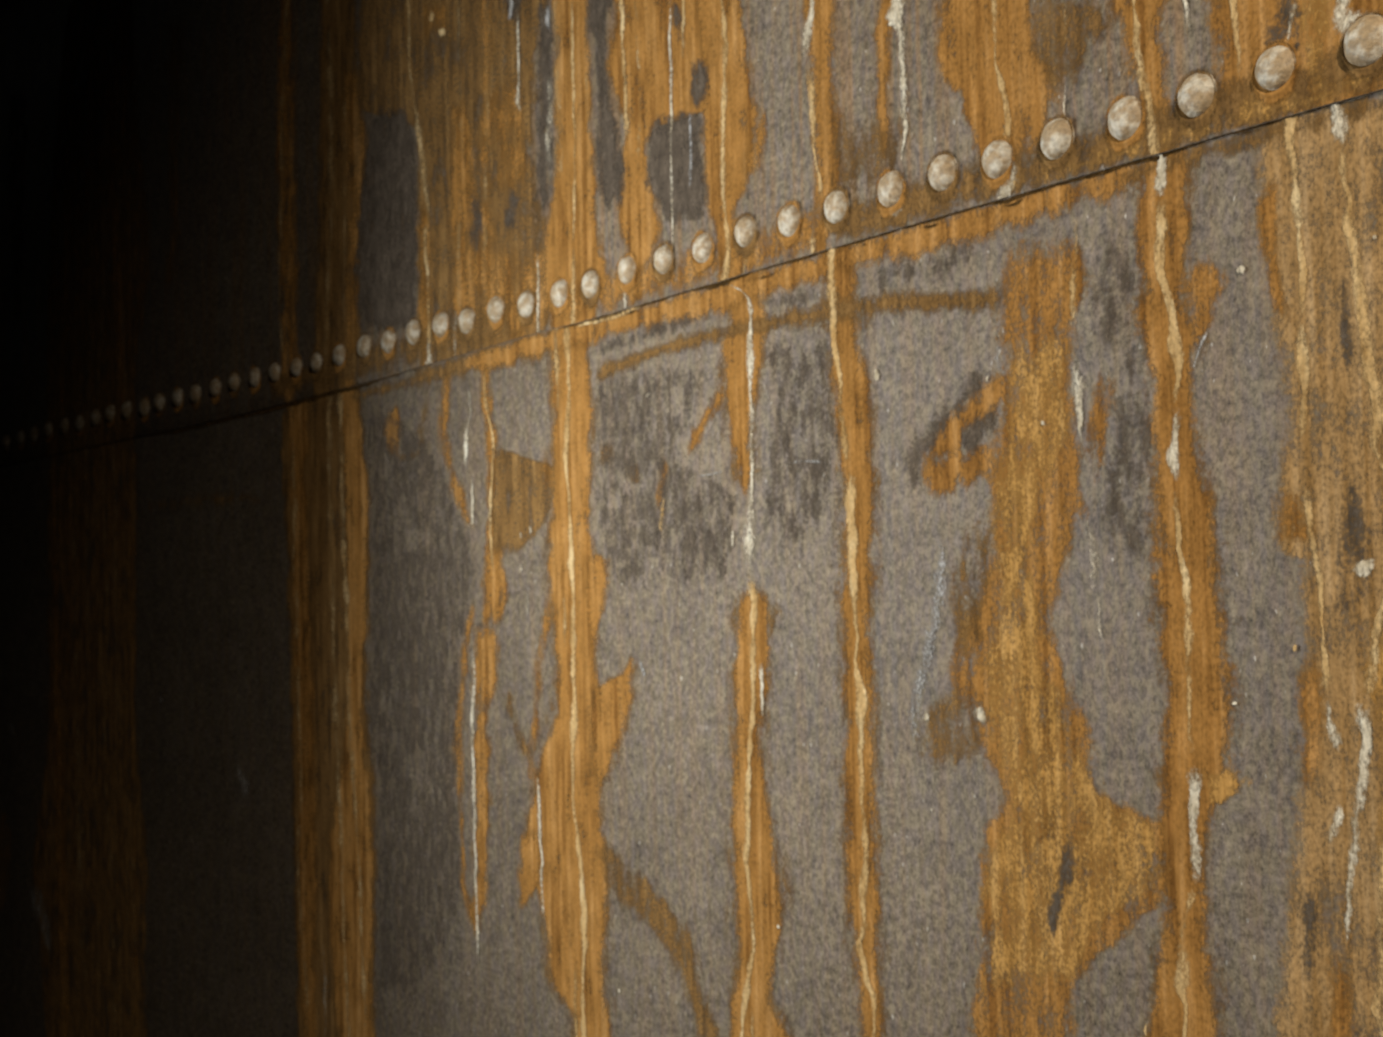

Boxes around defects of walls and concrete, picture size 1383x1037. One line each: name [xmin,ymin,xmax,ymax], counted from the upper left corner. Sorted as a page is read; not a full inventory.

water stain [886,0,908,159]
rust [1345,0,1383,25]
water stain [1284,117,1308,311]
water stain [1296,328,1310,433]
rust [272,0,1374,1037]
water stain [1304,487,1370,686]
water stain [1327,707,1341,745]
water stain [1345,710,1372,931]